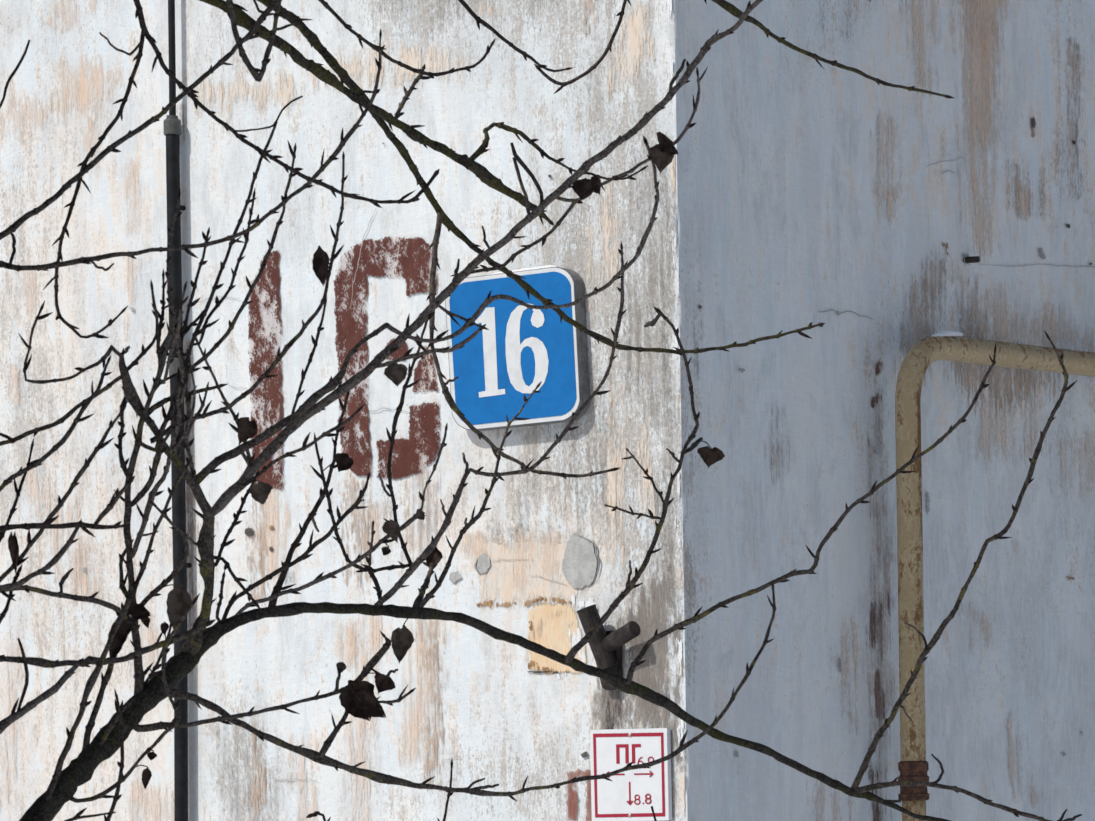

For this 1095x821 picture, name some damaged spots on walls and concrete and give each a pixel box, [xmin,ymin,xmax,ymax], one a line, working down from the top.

peeling [607,0,654,97]
peeling [587,181,619,288]
peeling [894,243,1018,372]
peeling [945,362,1060,416]
peeling [462,383,655,680]
rust [869,593,890,657]
rust [874,669,885,727]
rust [870,769,882,821]